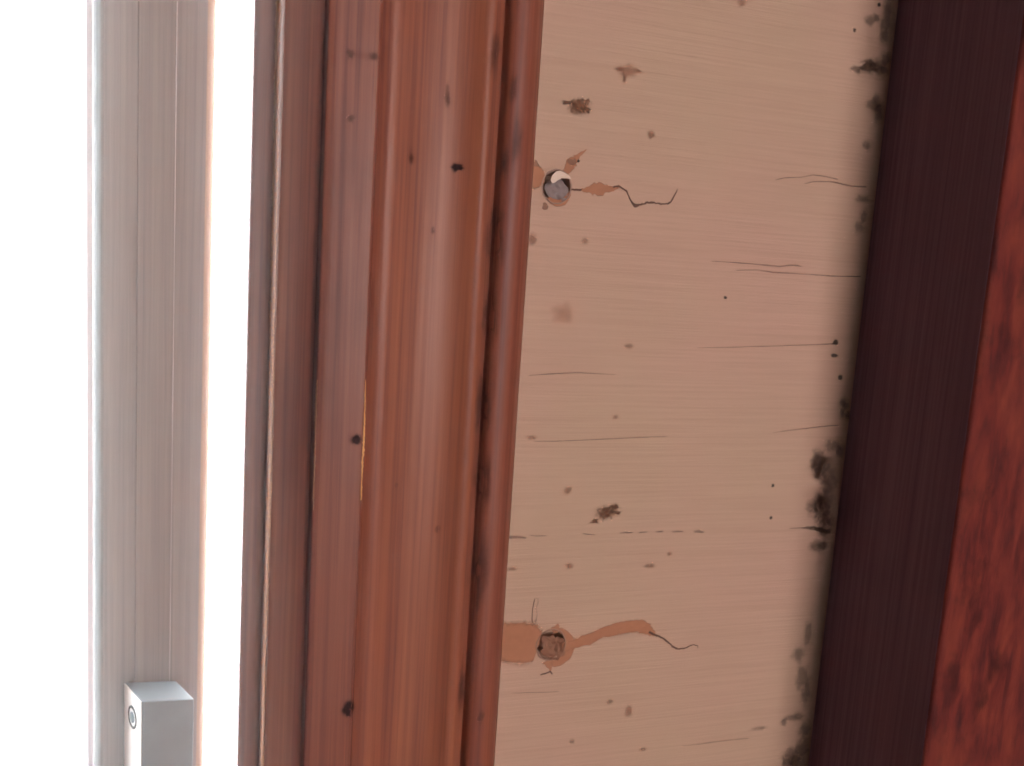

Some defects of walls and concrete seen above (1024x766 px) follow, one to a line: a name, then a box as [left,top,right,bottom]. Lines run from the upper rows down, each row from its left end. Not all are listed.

peeling [532,149,587,189]
crack [571,182,678,208]
flaking render [501,622,574,675]
crack [562,619,698,651]